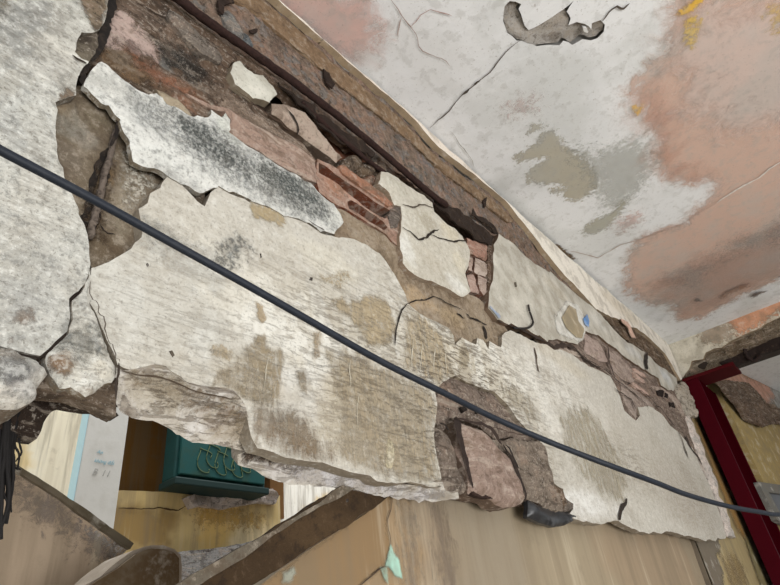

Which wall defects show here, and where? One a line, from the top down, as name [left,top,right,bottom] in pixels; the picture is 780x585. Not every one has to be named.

crack [603,3,630,20]
spalling [0,0,780,453]
crack [403,227,465,242]
crack [431,39,522,166]
damp [512,124,602,202]
damp [582,200,628,236]
crack [19,266,230,399]
spalling [434,378,573,512]